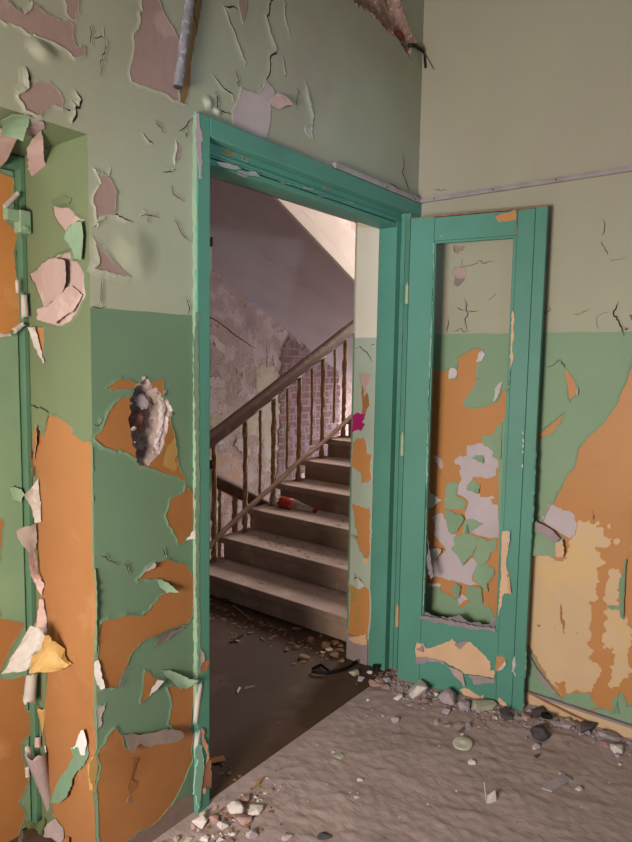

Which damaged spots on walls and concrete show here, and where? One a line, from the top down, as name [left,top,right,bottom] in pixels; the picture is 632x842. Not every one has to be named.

peeling [127,0,204,106]
peeling [231,79,293,141]
crack [211,0,315,135]
crack [186,296,275,379]
crack [445,293,497,334]
crack [573,301,628,337]
peeling [0,78,212,842]
peeling [210,361,341,485]
peeling [351,437,373,484]
peeling [422,234,515,624]
peeling [350,503,372,564]
peeling [414,356,632,714]